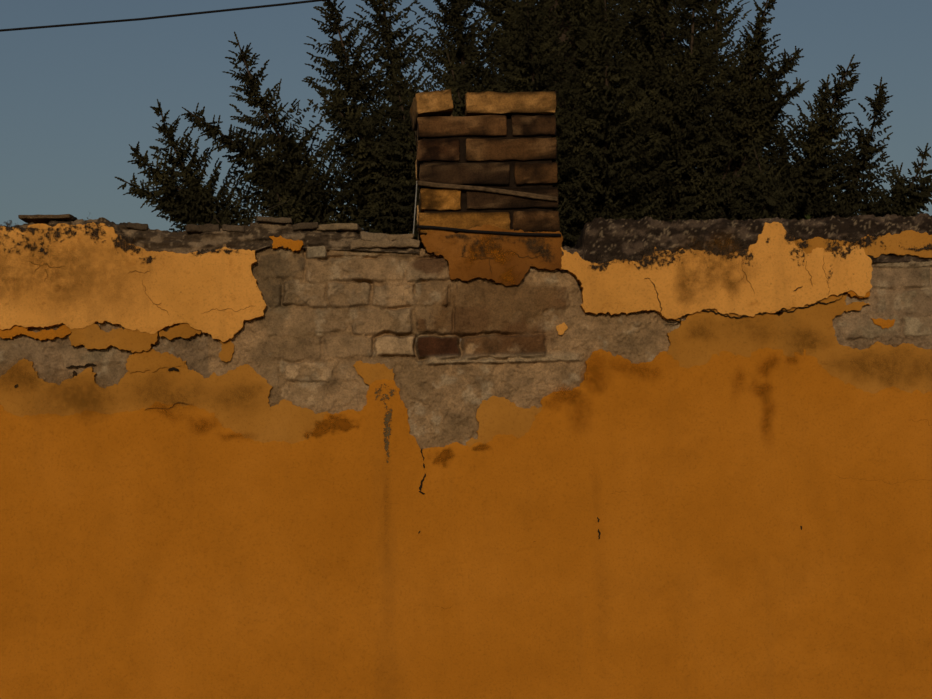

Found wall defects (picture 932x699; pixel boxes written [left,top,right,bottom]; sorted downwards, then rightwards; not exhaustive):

water stain [0,218,155,264]
water stain [590,237,753,275]
water stain [784,226,810,263]
water stain [826,232,883,259]
spalling [0,216,932,463]
crack [418,449,426,495]